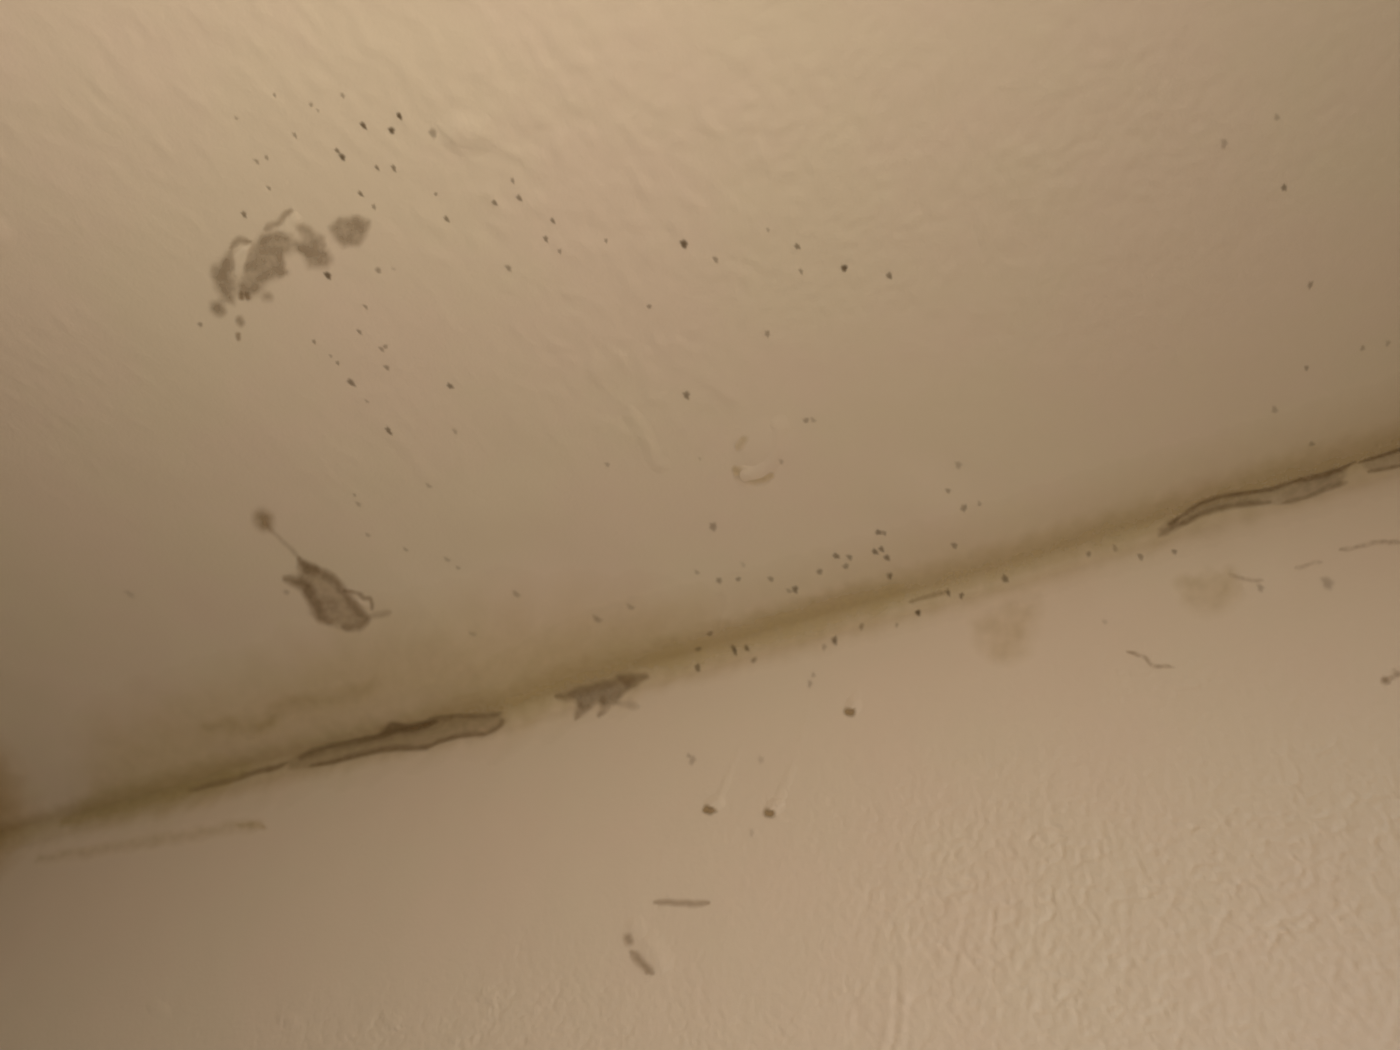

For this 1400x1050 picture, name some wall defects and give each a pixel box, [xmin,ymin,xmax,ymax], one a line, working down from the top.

crack [365,721,435,739]